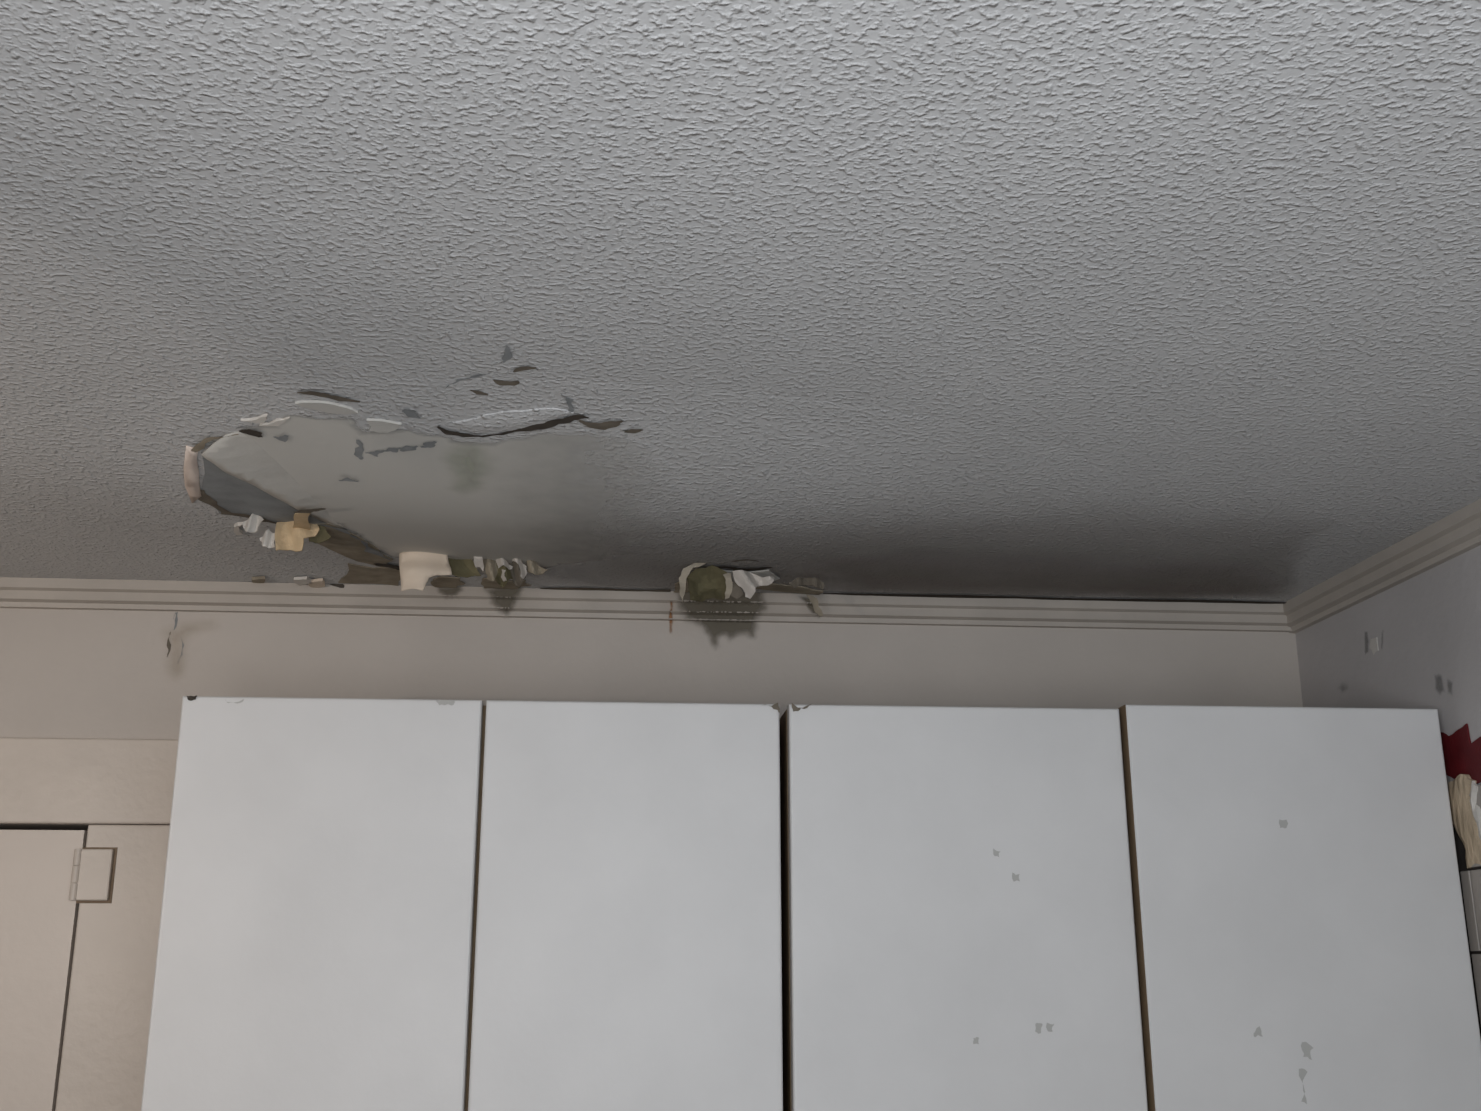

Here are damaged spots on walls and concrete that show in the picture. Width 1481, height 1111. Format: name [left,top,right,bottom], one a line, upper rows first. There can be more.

crack [437,346,643,437]
peeling [183,391,592,591]
peeling [673,559,824,617]
spalling [1441,724,1481,868]